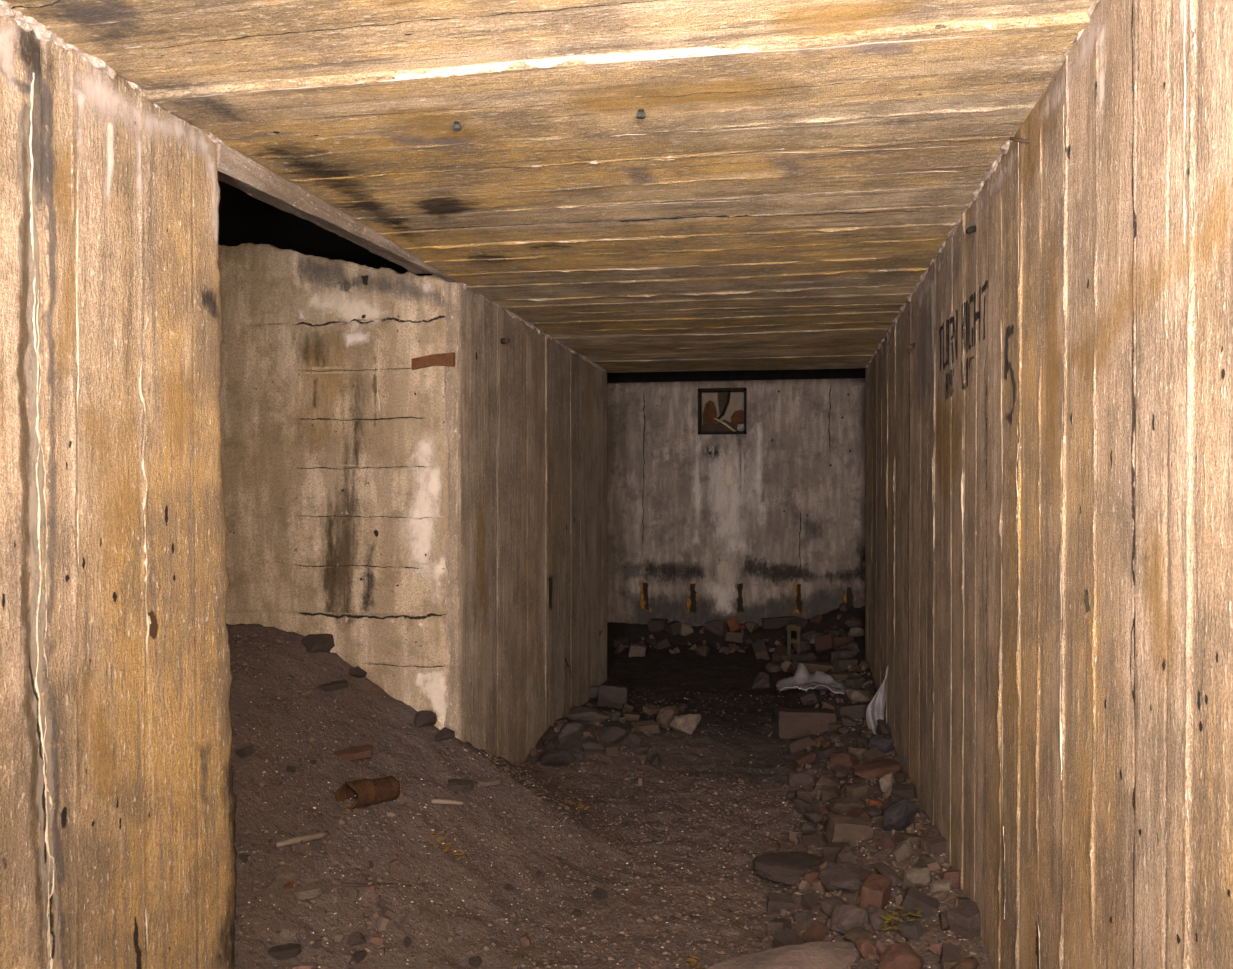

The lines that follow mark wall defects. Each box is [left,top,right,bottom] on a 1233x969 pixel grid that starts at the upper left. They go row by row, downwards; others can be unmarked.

leakage [258,147,412,237]
leakage [417,197,475,215]
crack [293,316,445,327]
leakage [626,423,865,627]
leakage [324,487,374,617]
corrosion [639,581,652,612]
corrosion [686,583,698,613]
corrosion [735,583,744,613]
corrosion [793,582,805,616]
crack [297,612,445,626]